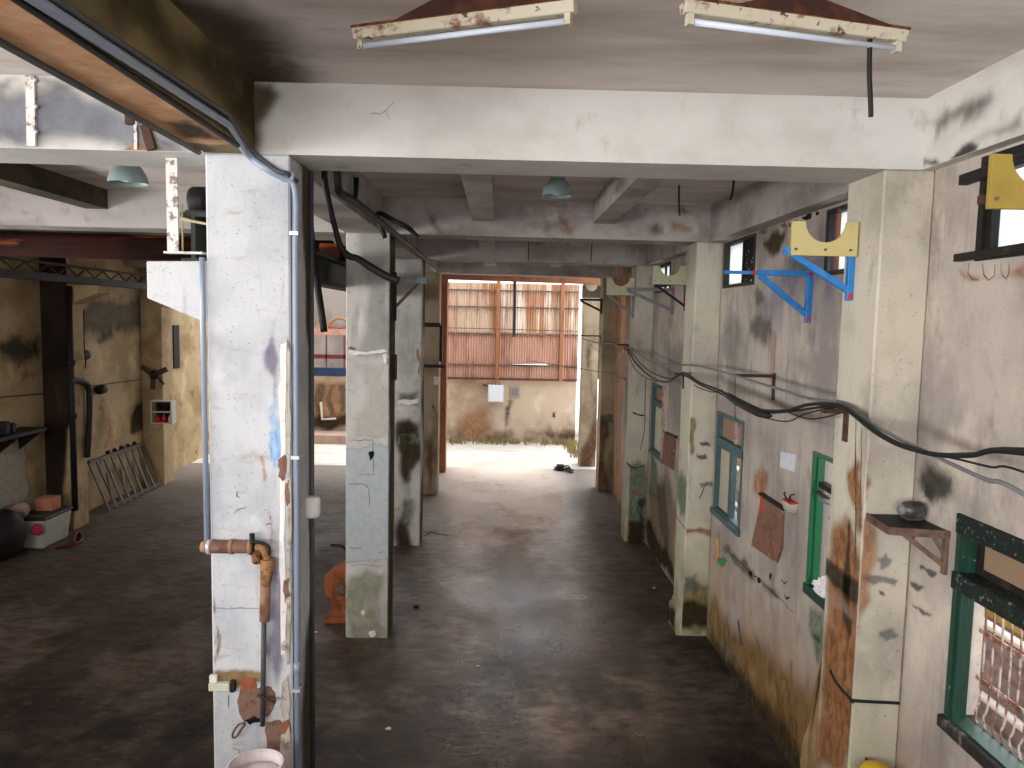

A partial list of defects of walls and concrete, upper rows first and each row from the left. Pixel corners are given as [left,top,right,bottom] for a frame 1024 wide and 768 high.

water stain [959,101,985,115]
water stain [953,144,976,158]
water stain [0,336,40,364]
water stain [396,420,420,482]
water stain [920,465,952,501]
water stain [396,502,413,546]
peeling [237,339,292,768]
water stain [628,458,813,768]
water stain [810,611,823,660]
corrosion [816,428,874,768]